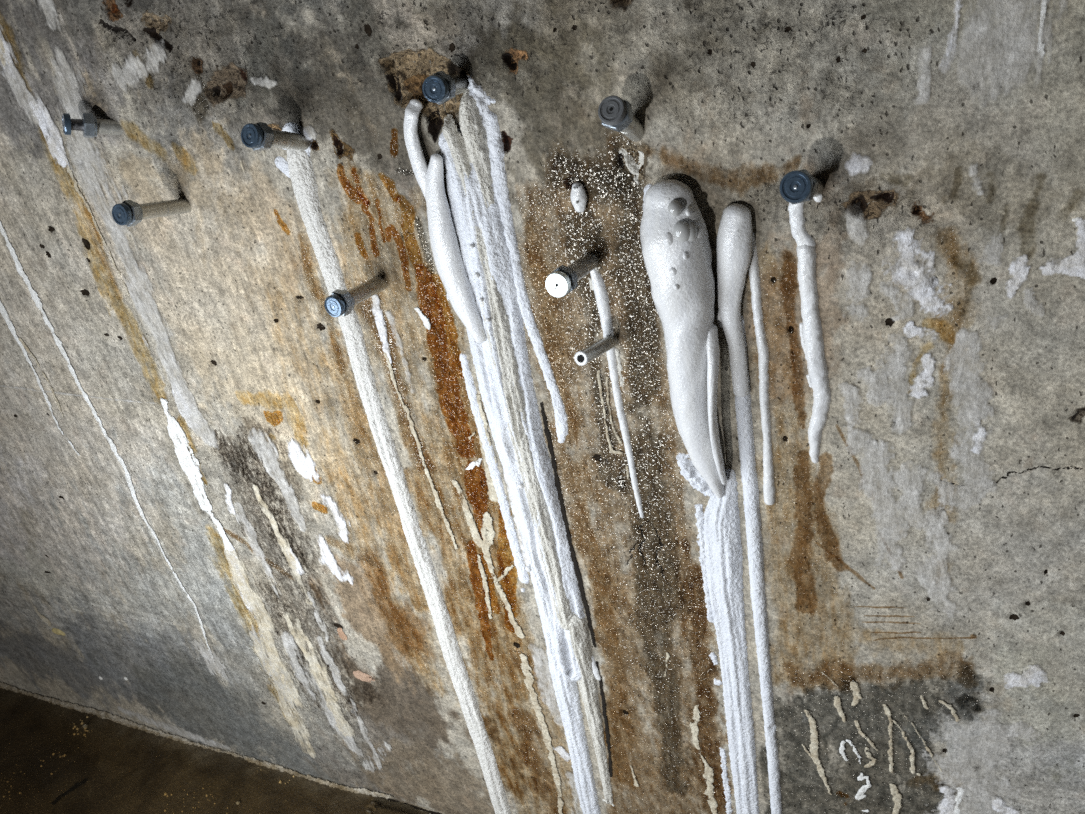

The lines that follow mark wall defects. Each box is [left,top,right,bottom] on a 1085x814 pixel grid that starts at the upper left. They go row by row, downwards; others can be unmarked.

leakage [39,0,58,30]
crack [98,19,136,42]
leakage [553,141,666,404]
leakage [0,31,391,772]
leakage [364,295,458,549]
corrosion [338,164,516,660]
leakage [451,395,529,639]
leakage [593,368,725,814]
leakage [519,648,582,814]
leakage [760,660,1047,814]